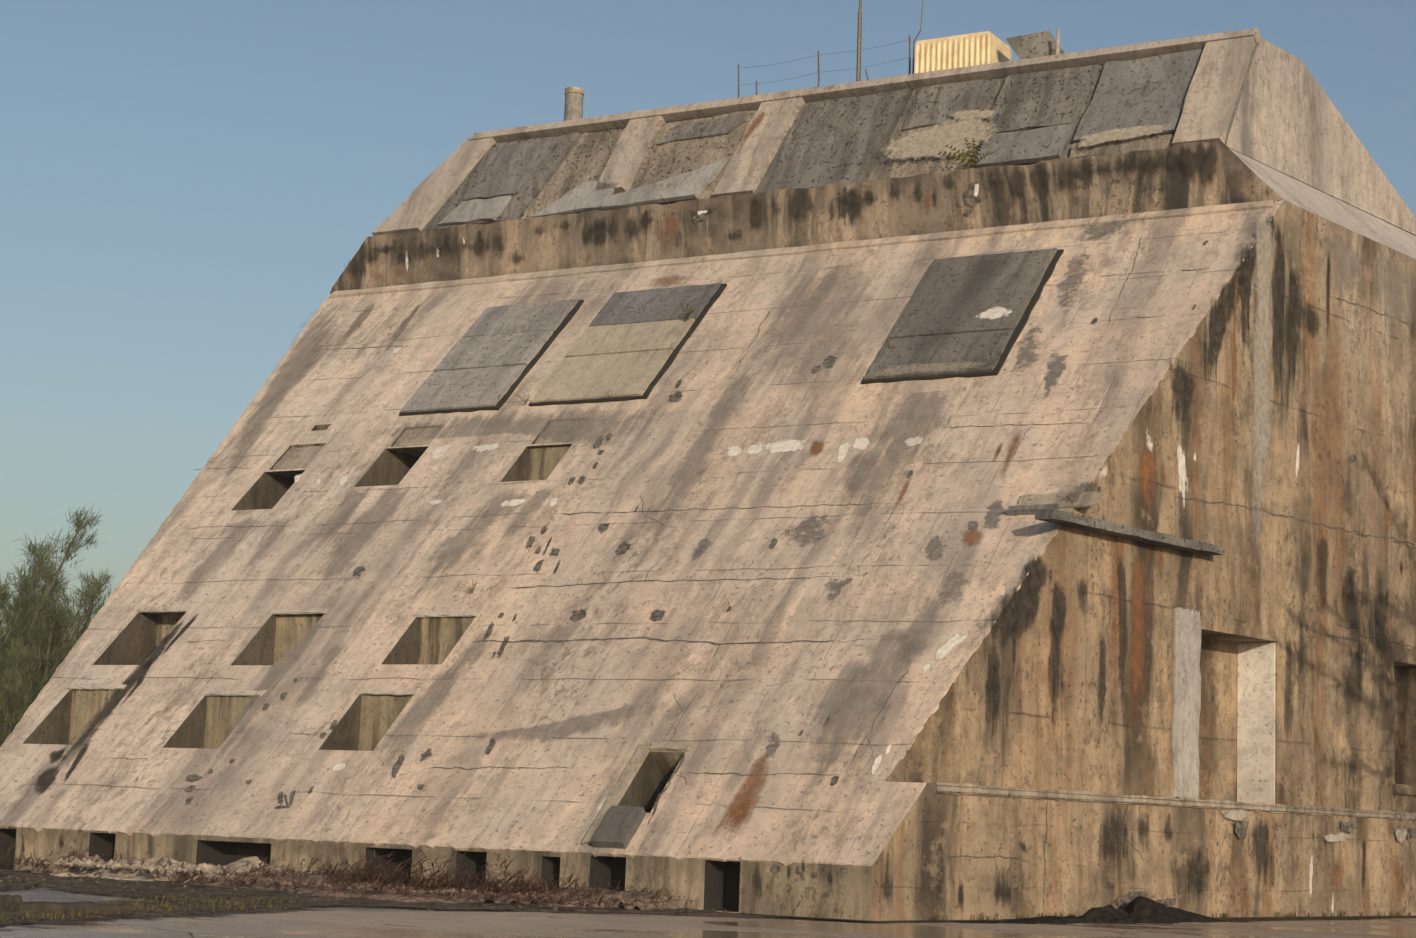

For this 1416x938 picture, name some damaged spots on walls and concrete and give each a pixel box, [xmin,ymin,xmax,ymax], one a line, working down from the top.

leakage [830,188,874,224]
leakage [348,230,521,274]
leakage [1057,221,1129,306]
leakage [1171,216,1330,534]
spalling [568,433,611,485]
peeling [727,439,807,457]
peeling [837,437,869,463]
peeling [501,499,526,507]
spalling [526,525,560,574]
leakage [984,558,1087,732]
leakage [1098,560,1127,715]
corrosion [728,757,765,824]